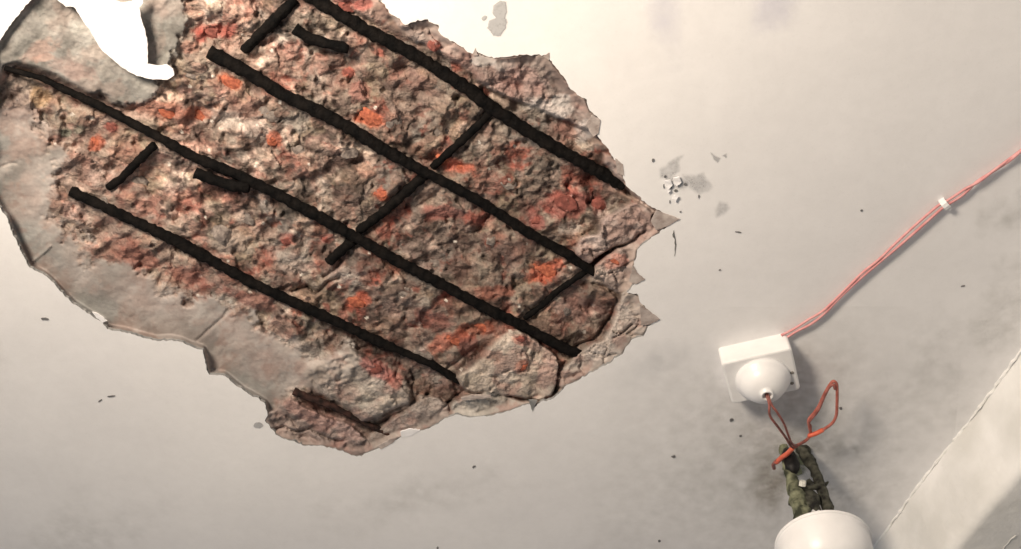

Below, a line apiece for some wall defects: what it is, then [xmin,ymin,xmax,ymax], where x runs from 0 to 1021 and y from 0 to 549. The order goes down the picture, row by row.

spalling [0,0,687,456]